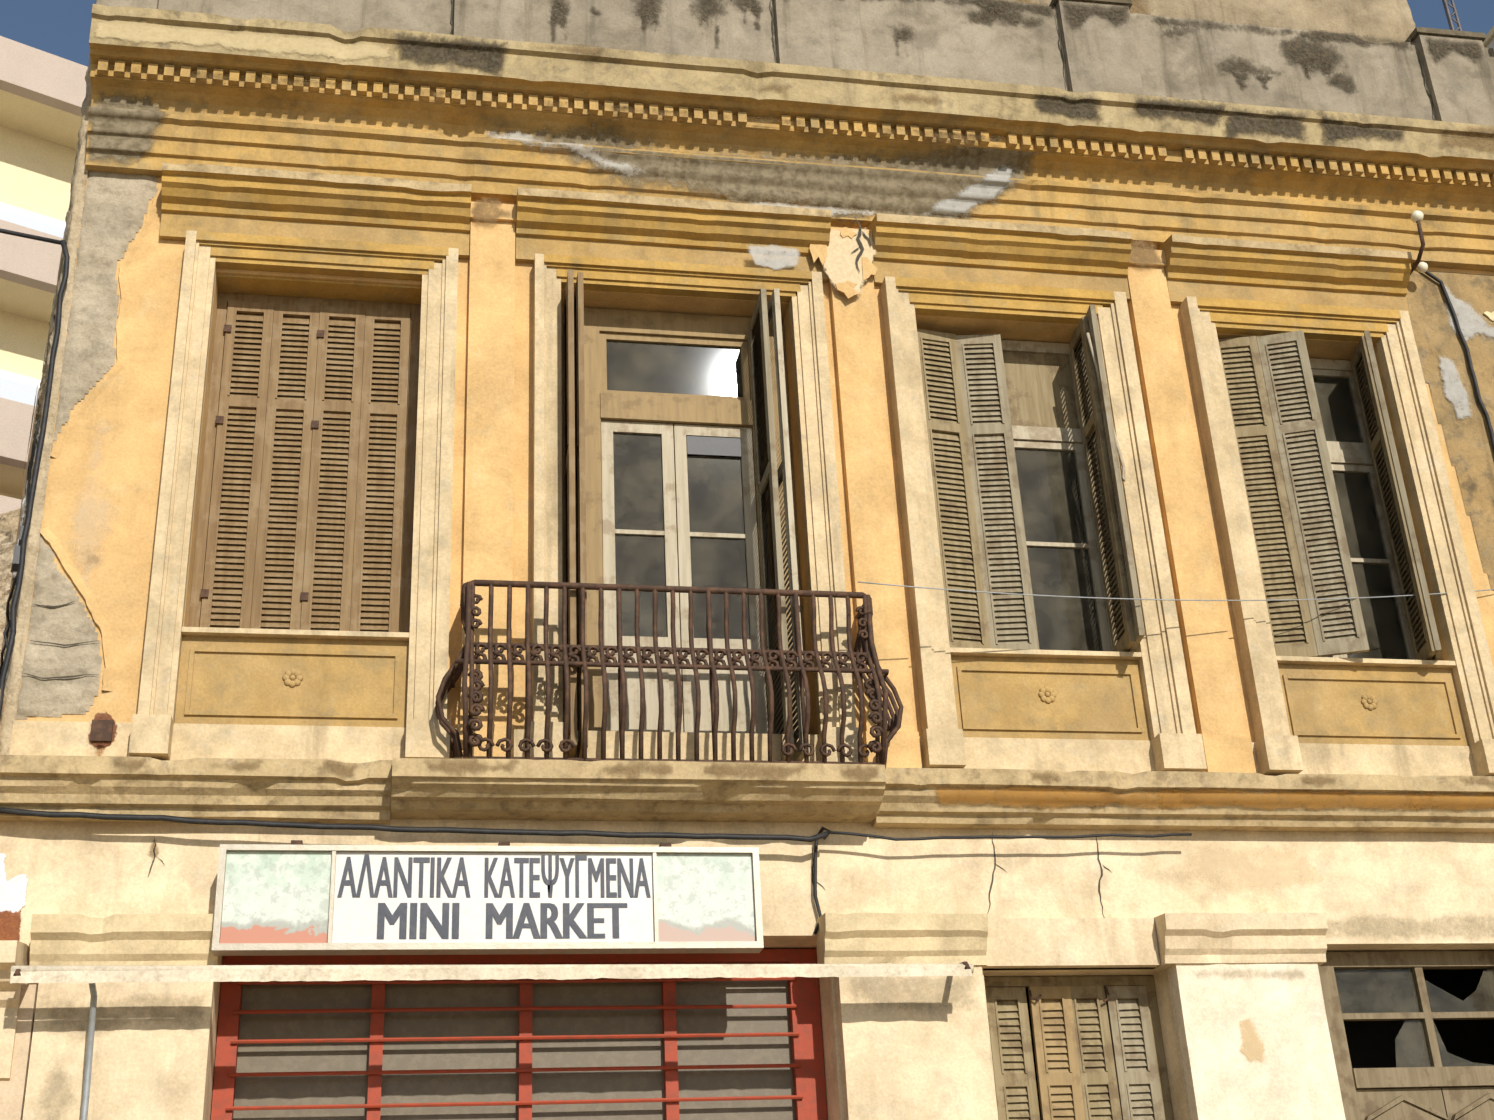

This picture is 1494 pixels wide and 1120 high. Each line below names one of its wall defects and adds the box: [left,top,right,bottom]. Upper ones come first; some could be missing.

damp [933,0,1227,36]
mould [1245,25,1408,93]
damp [88,92,167,164]
mould [1035,95,1102,119]
mould [1135,99,1403,143]
damp [488,125,1036,224]
peeling [809,227,878,299]
flaking render [0,153,162,720]
flaking render [1406,270,1494,589]
peeling [0,853,28,941]
crack [987,832,1004,914]
crack [1096,837,1110,918]